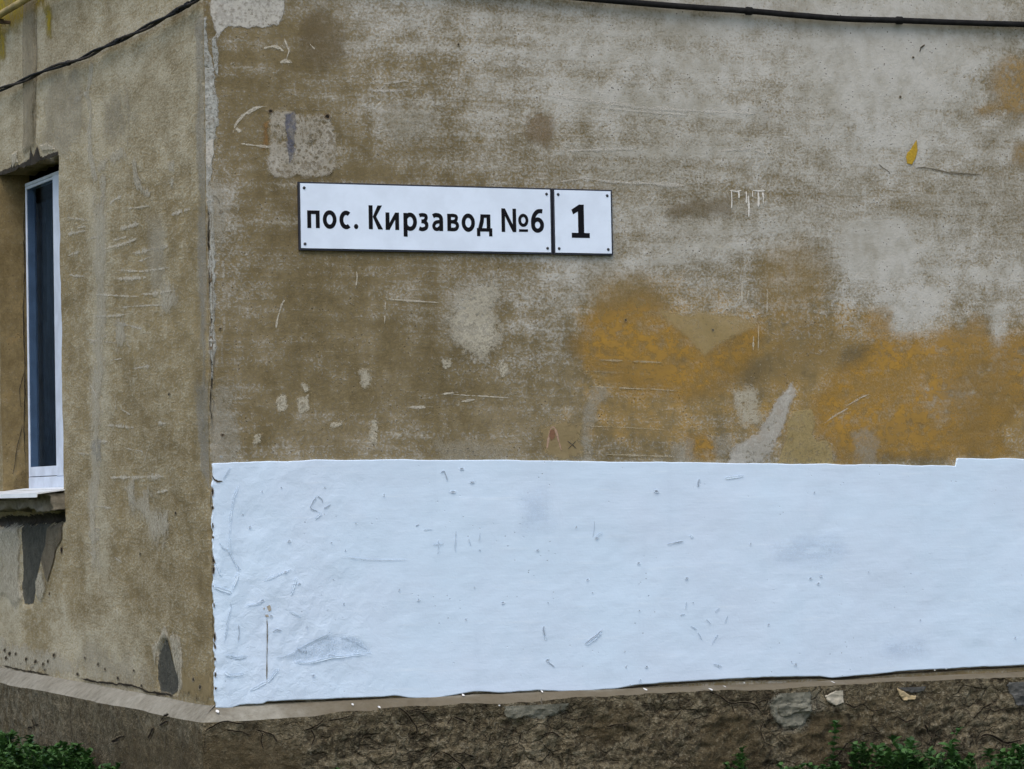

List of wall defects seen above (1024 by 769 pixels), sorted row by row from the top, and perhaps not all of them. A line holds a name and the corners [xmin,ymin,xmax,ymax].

flaking render [735,389,759,423]